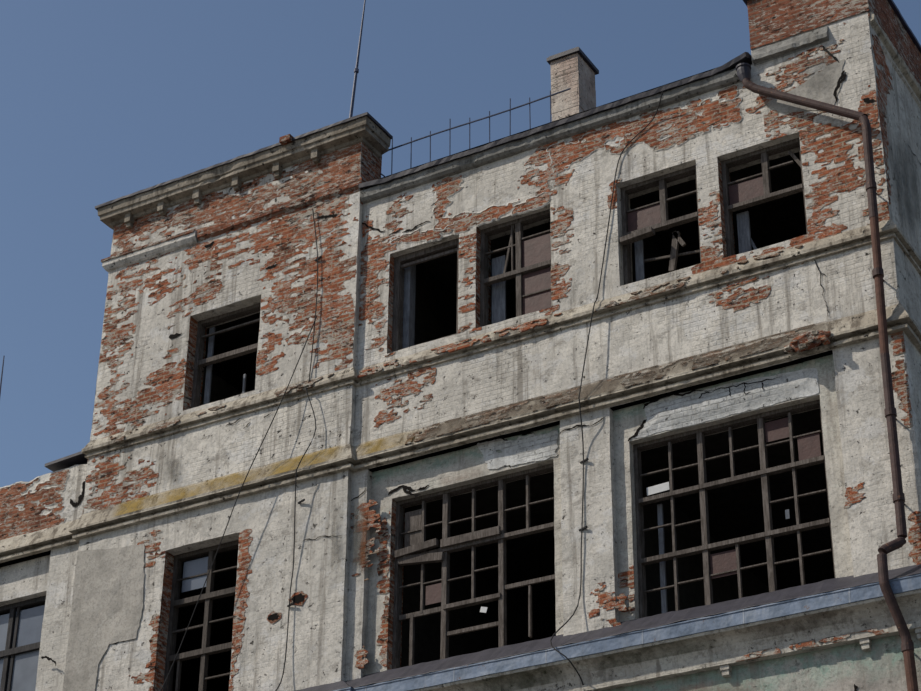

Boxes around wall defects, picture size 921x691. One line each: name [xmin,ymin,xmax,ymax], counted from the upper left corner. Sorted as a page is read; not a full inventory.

crack [823,46,846,103]
peeling [82,34,894,513]
spalling [889,331,913,429]
spalling [0,468,71,540]
spalling [129,614,160,691]
peeling [137,529,165,568]
spalling [229,529,253,691]
spalling [266,610,281,624]
spalling [288,591,308,606]
spalling [350,499,391,669]
peeling [589,565,635,627]
spalling [735,628,889,662]